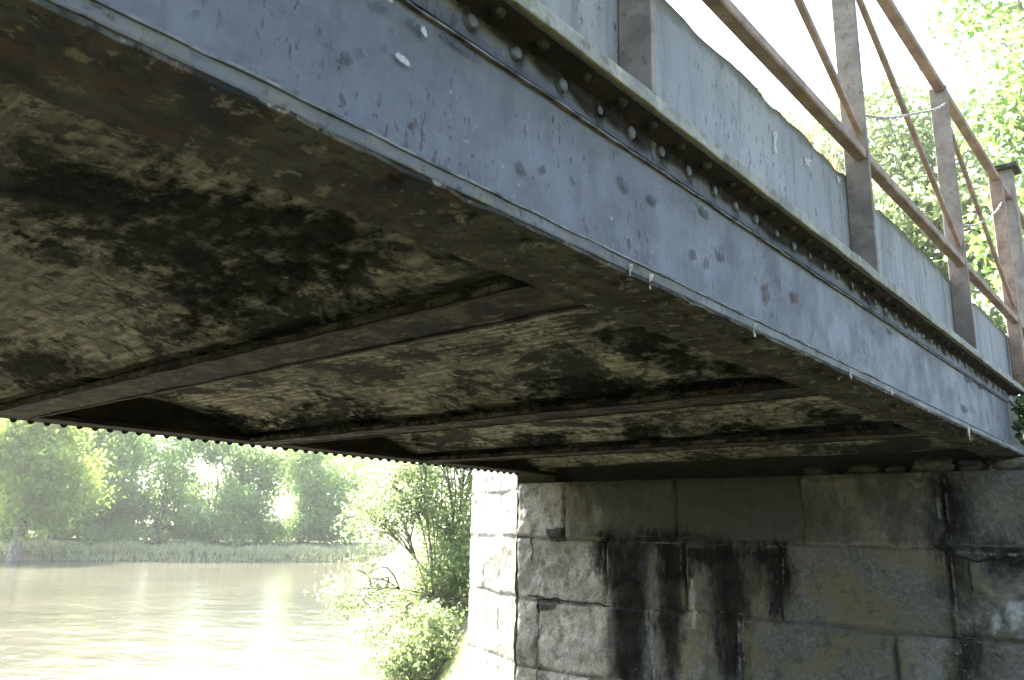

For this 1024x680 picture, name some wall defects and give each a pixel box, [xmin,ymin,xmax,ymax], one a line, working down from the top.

water stain [0,148,397,394]
water stain [499,321,768,405]
water stain [511,429,579,449]
water stain [695,415,775,437]
water stain [800,406,874,429]
water stain [929,476,974,607]
water stain [983,543,1024,573]
water stain [595,530,791,680]
water stain [991,602,1024,632]
water stain [954,634,983,680]